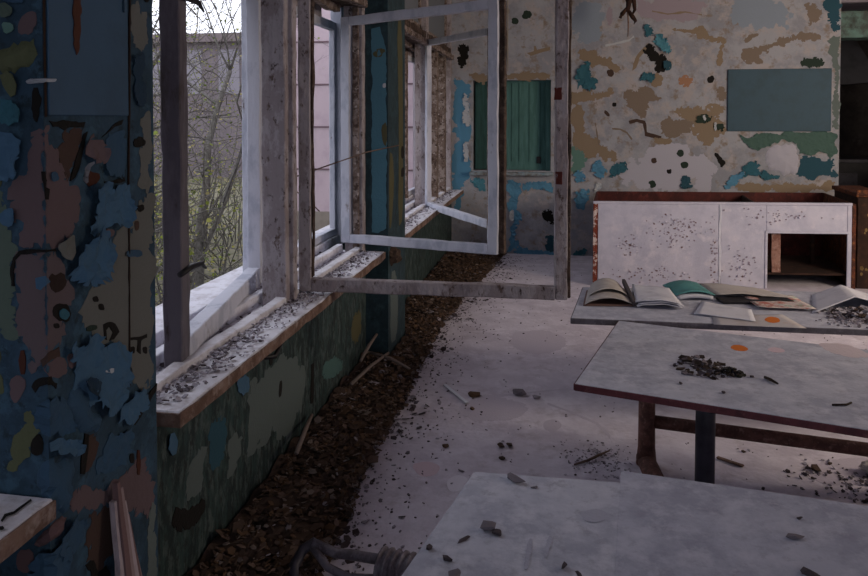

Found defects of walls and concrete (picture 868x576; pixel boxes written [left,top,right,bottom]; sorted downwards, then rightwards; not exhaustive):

peeling [0,0,159,425]
peeling [452,78,486,210]
peeling [506,180,554,255]
peeling [575,61,598,92]
peeling [571,142,725,210]
flaking render [640,24,672,87]
peeling [696,114,725,132]
peeling [724,0,842,193]
peeling [7,410,99,473]
flaking render [16,453,158,576]